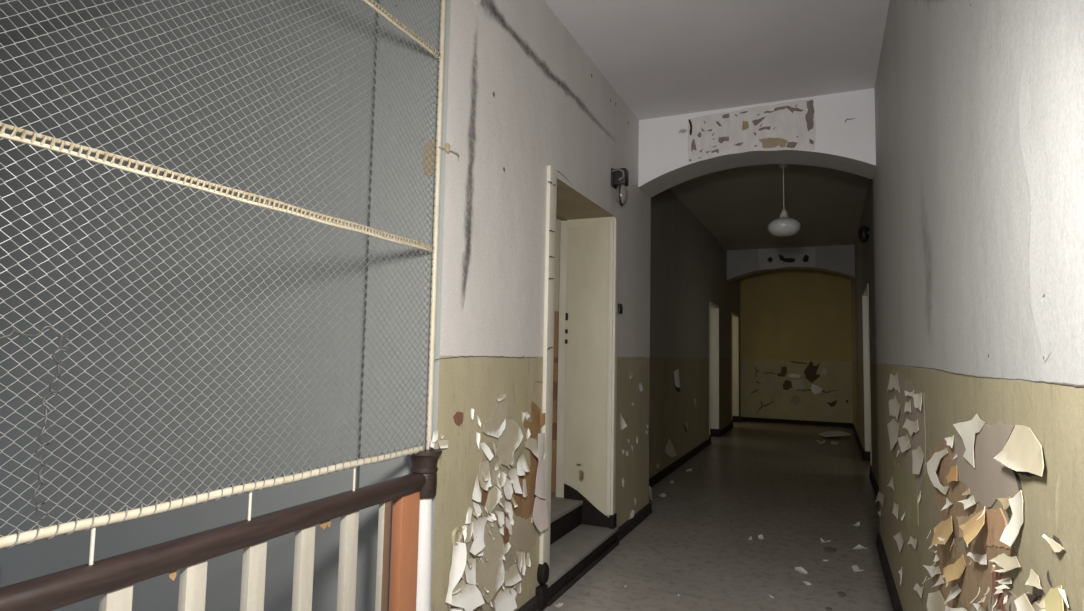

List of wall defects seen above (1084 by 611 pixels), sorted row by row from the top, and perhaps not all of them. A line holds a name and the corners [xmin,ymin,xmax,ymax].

leakage [493,7,582,105]
leakage [464,68,476,271]
peeling [687,99,816,163]
peeling [765,361,848,407]
peeling [620,415,648,456]
peeling [445,393,557,611]
peeling [875,370,1070,611]